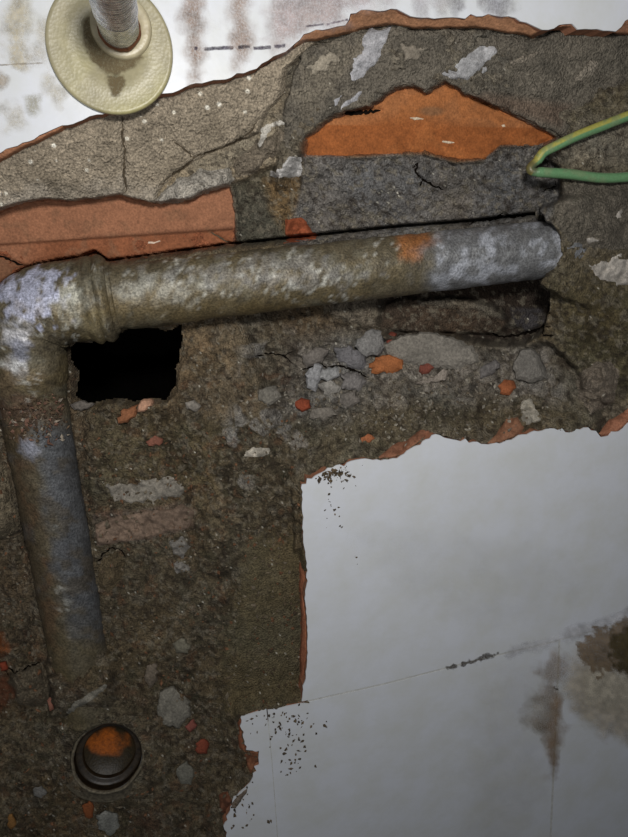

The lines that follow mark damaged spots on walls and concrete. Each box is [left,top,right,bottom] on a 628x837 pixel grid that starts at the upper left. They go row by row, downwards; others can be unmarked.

damp [232,0,250,58]
crack [120,119,128,193]
crack [158,120,258,187]
spalling [0,10,628,282]
spalling [379,430,429,458]
spalling [488,417,524,443]
spalling [599,409,628,436]
flaking render [95,504,194,546]
spalling [298,562,307,688]
damp [566,619,628,741]
corrosion [84,726,135,775]
spalling [237,718,258,773]